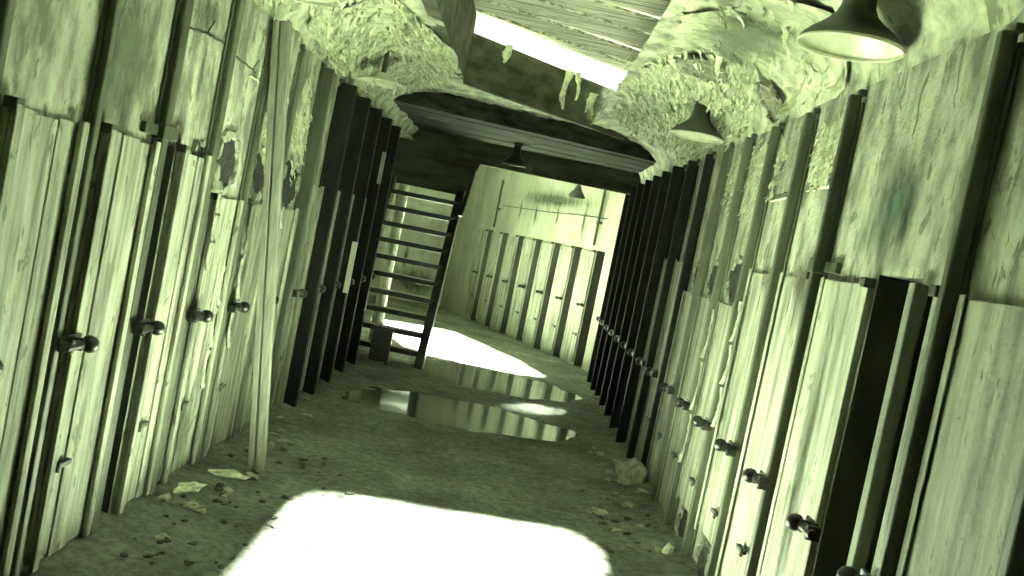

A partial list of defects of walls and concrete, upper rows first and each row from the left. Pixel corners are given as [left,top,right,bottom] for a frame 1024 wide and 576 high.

crack [189,21,262,81]
flaking render [280,78,313,229]
flaking render [254,0,458,98]
flaking render [590,0,847,220]
spalling [190,108,268,389]
spalling [677,255,743,463]
spalling [675,503,688,537]